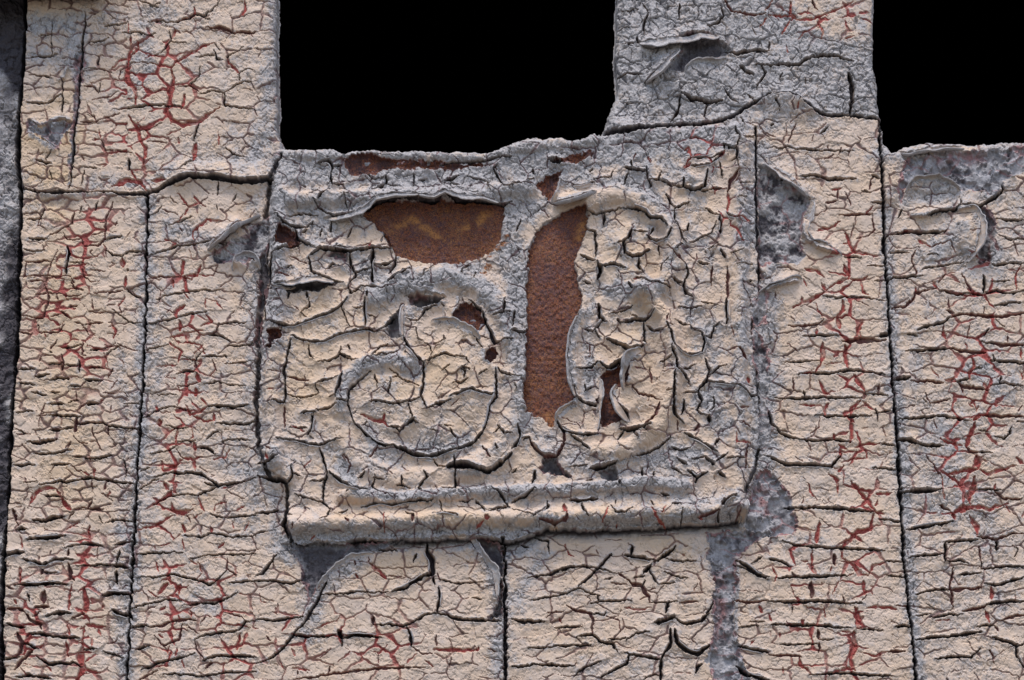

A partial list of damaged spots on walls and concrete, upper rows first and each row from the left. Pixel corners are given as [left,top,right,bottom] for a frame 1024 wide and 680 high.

crack [27,0,257,193]
peeling [206,211,352,359]
crack [5,155,714,680]
peeling [342,153,490,183]
rust [329,190,520,281]
rust [523,191,597,438]
peeling [596,346,648,430]
peeling [638,21,733,99]
crack [651,492,743,530]
crack [570,0,856,483]
peeling [750,162,843,455]
crack [734,174,1024,680]